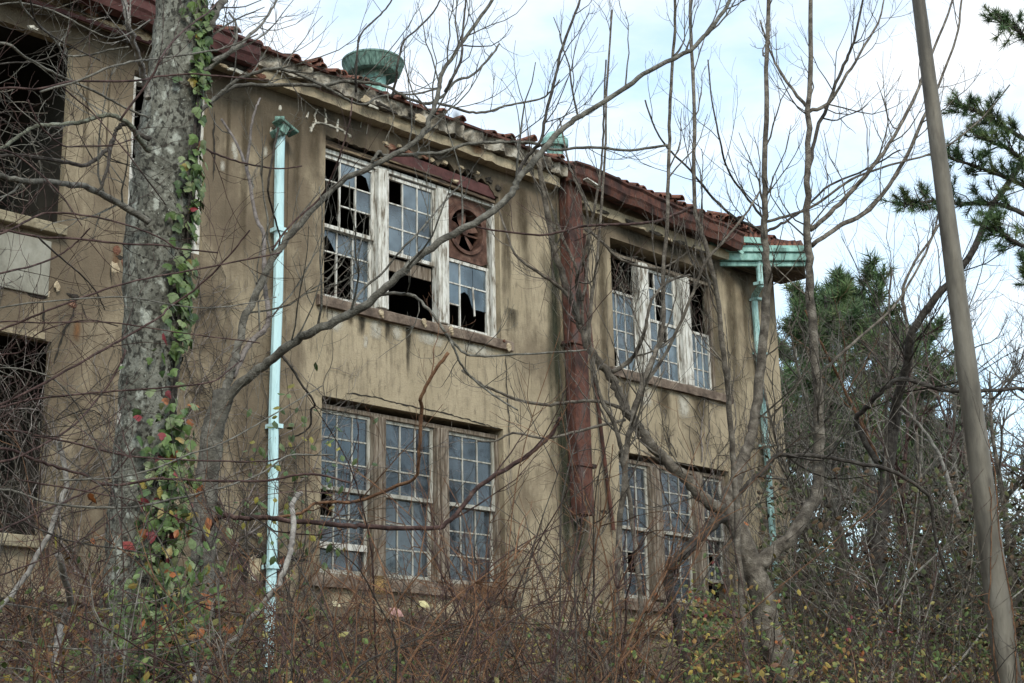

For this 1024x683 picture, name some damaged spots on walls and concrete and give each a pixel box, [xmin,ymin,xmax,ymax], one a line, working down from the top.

peeling [306,108,368,138]
spalling [361,95,426,124]
spalling [383,141,501,192]
water stain [333,314,438,362]
water stain [643,390,705,418]